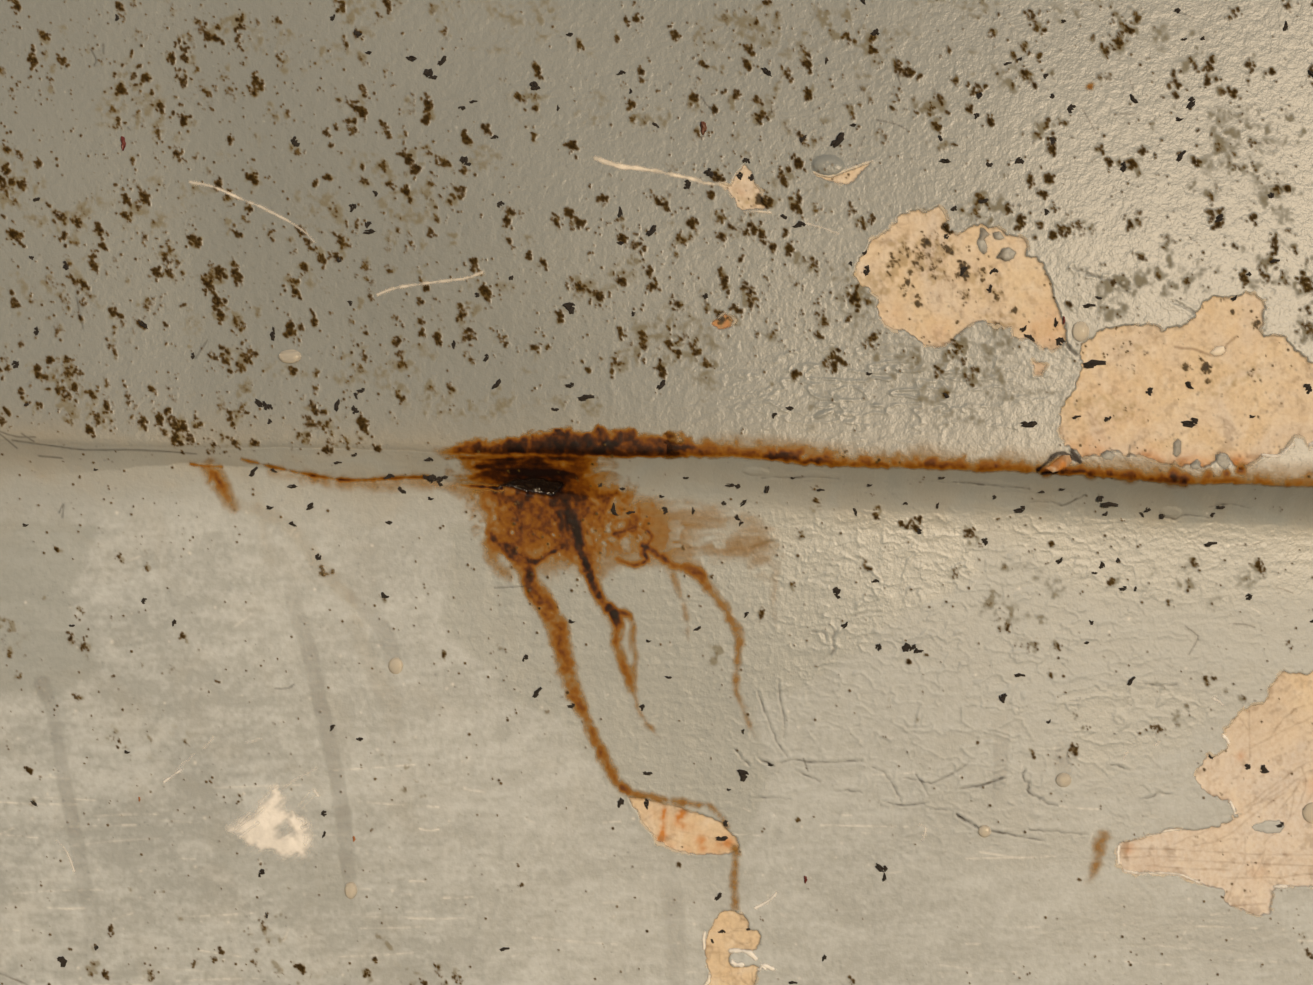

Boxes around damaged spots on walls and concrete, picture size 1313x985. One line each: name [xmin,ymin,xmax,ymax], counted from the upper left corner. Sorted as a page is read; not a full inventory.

peeling [720,165,771,213]
peeling [854,205,1066,376]
peeling [1046,292,1313,472]
rust [190,460,235,509]
rust [241,424,1313,827]
peeling [630,797,739,855]
rust [730,846,740,909]
rust [1092,832,1107,873]
peeling [1115,671,1313,917]
peeling [702,910,775,985]